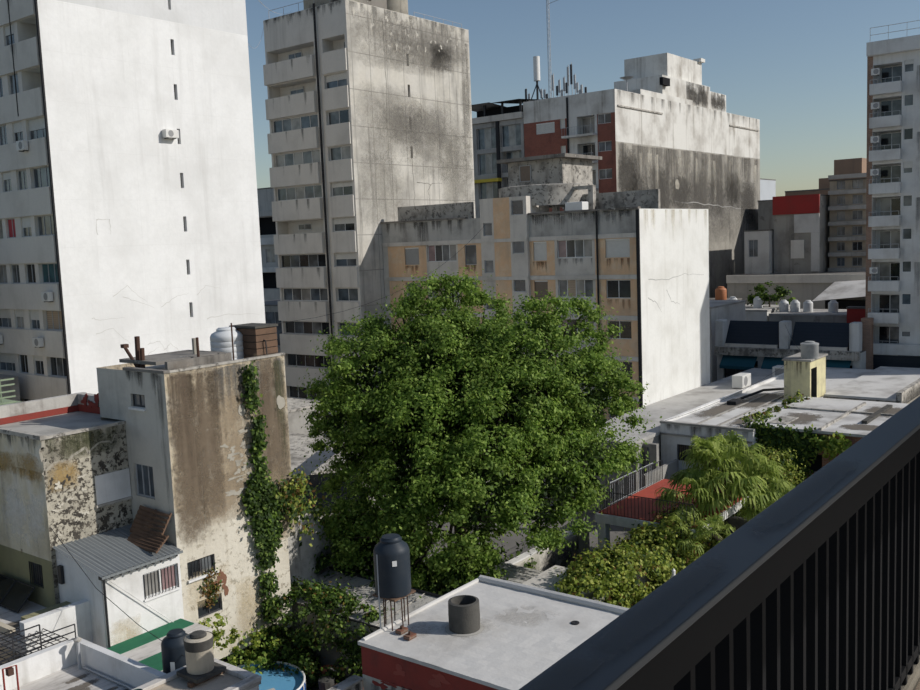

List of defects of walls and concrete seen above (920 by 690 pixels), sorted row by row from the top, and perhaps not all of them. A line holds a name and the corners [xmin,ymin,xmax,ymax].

leakage [619,144,757,226]
crack [648,273,704,307]
flaking render [99,453,124,472]
leakage [161,358,289,539]
flaking render [48,468,127,546]